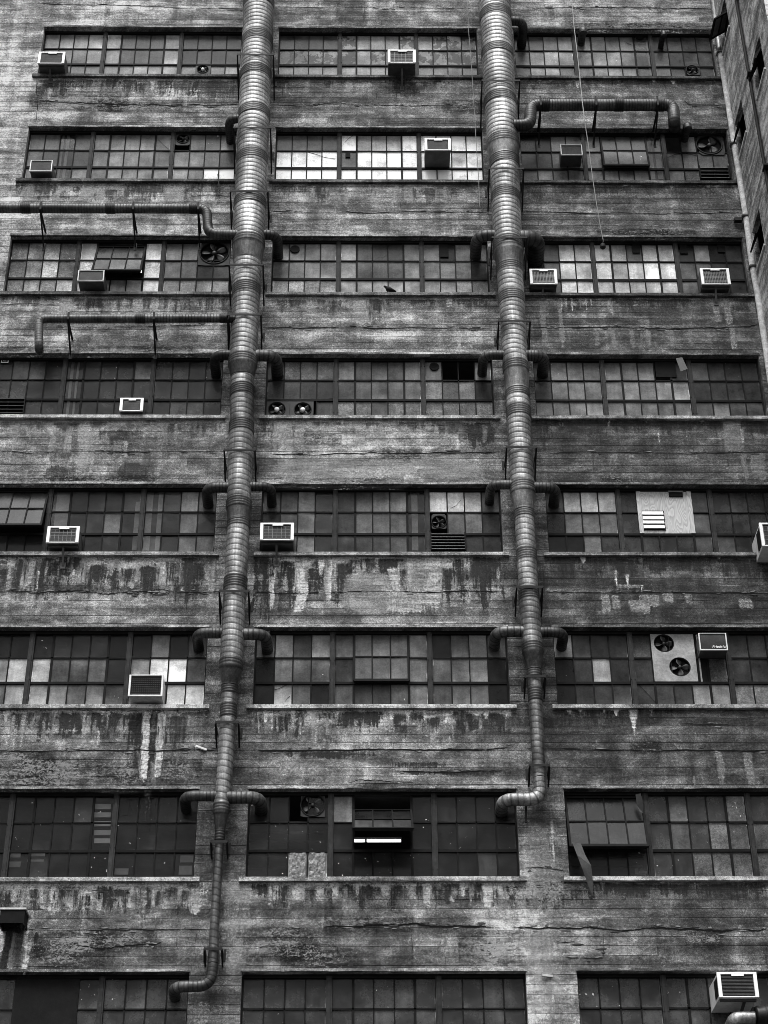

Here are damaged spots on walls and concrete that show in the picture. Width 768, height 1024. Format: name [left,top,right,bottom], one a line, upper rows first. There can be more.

damp [0,557,217,609]
damp [252,557,505,633]
damp [252,709,511,759]
damp [0,710,206,821]
damp [392,762,511,775]
damp [252,882,517,911]
damp [0,882,208,973]
crack [292,919,766,966]